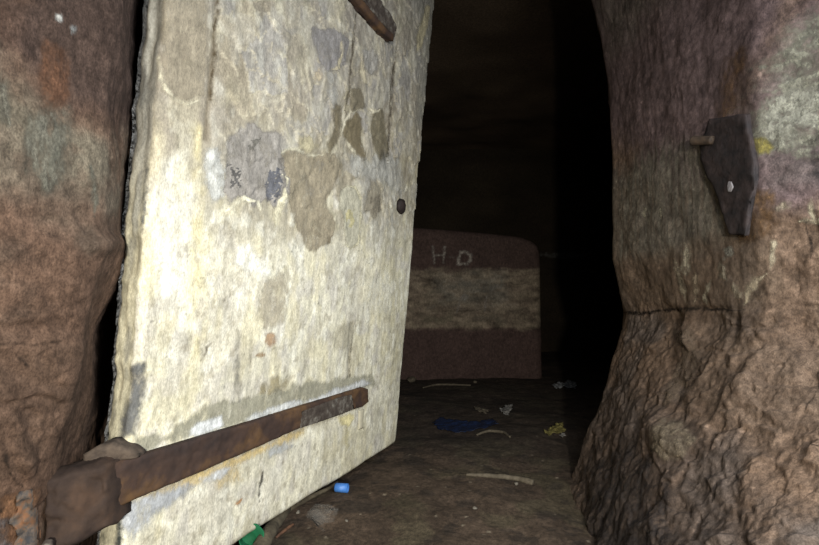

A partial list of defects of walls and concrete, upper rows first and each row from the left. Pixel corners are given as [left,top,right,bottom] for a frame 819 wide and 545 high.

crack [626,307,740,315]
corrosion [145,432,302,498]